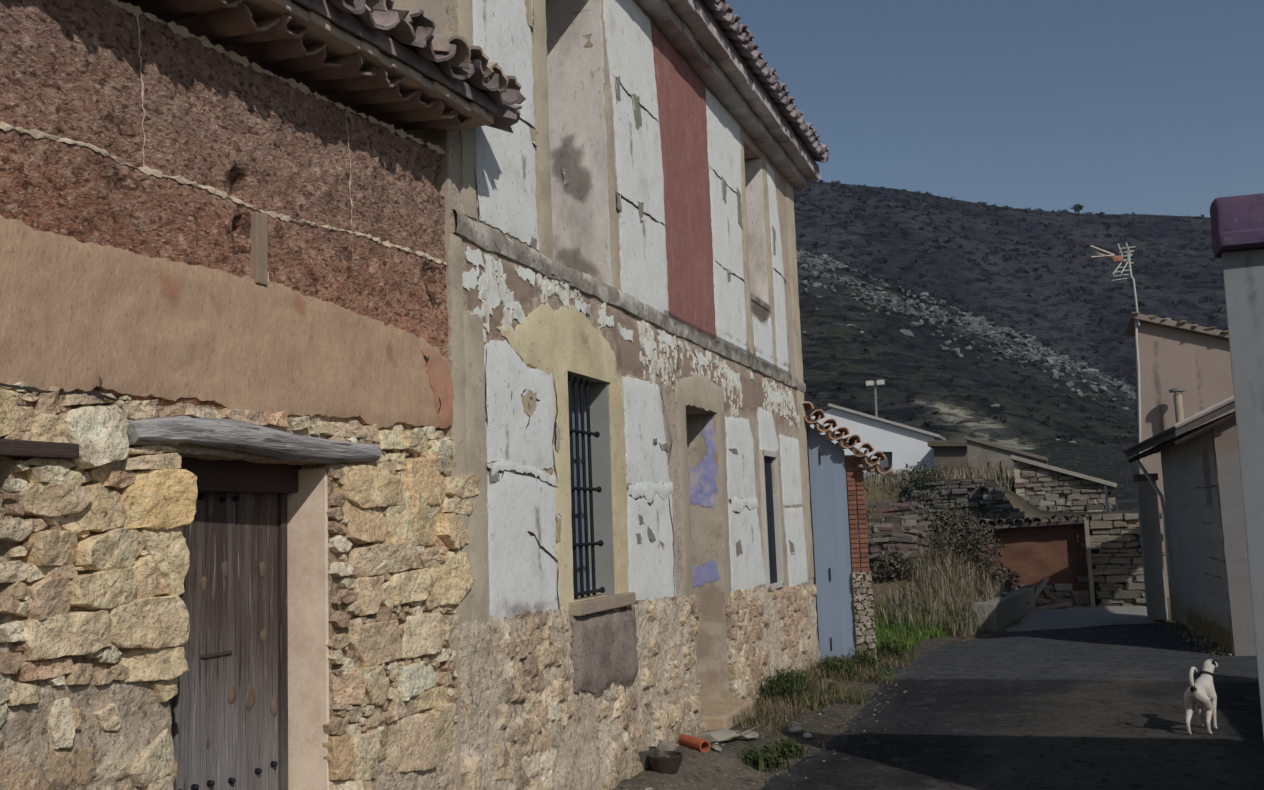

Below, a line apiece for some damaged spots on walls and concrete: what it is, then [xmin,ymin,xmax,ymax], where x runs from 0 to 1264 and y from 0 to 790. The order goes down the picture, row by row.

spalling [421,265,447,308]
peeling [462,246,800,428]
peeling [420,346,454,428]
peeling [486,459,557,487]
peeling [689,415,758,514]
crack [528,531,560,610]
peeling [693,561,719,587]